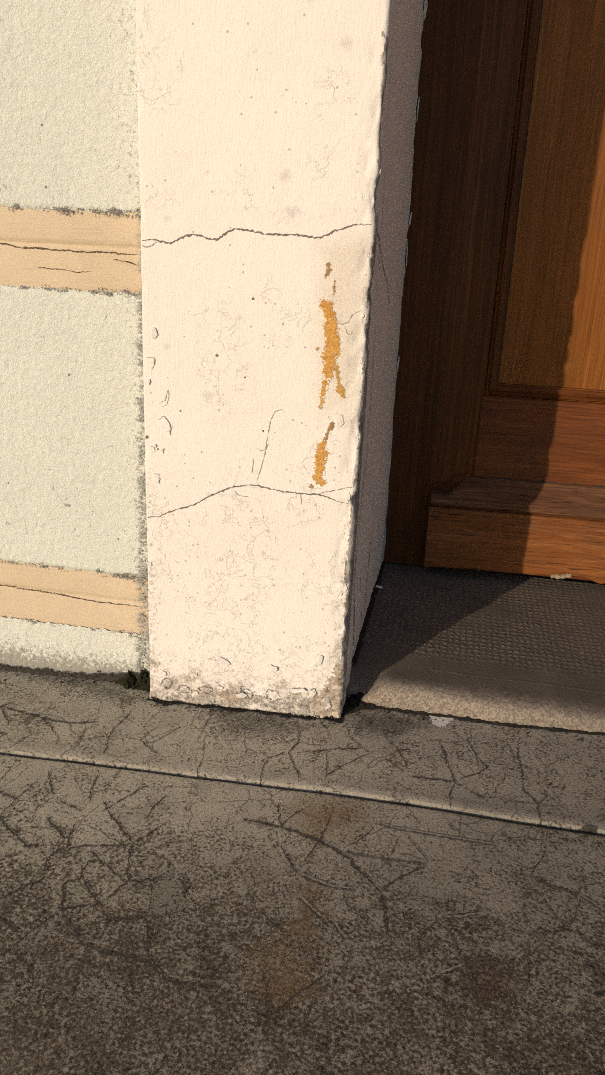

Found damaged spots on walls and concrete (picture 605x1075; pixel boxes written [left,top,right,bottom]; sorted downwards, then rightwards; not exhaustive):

crack [0,223,390,302]
corrosion [315,262,346,408]
crack [148,311,390,627]
corrosion [308,422,335,488]
crack [0,702,187,986]
crack [243,728,605,993]
crack [262,965,324,1014]